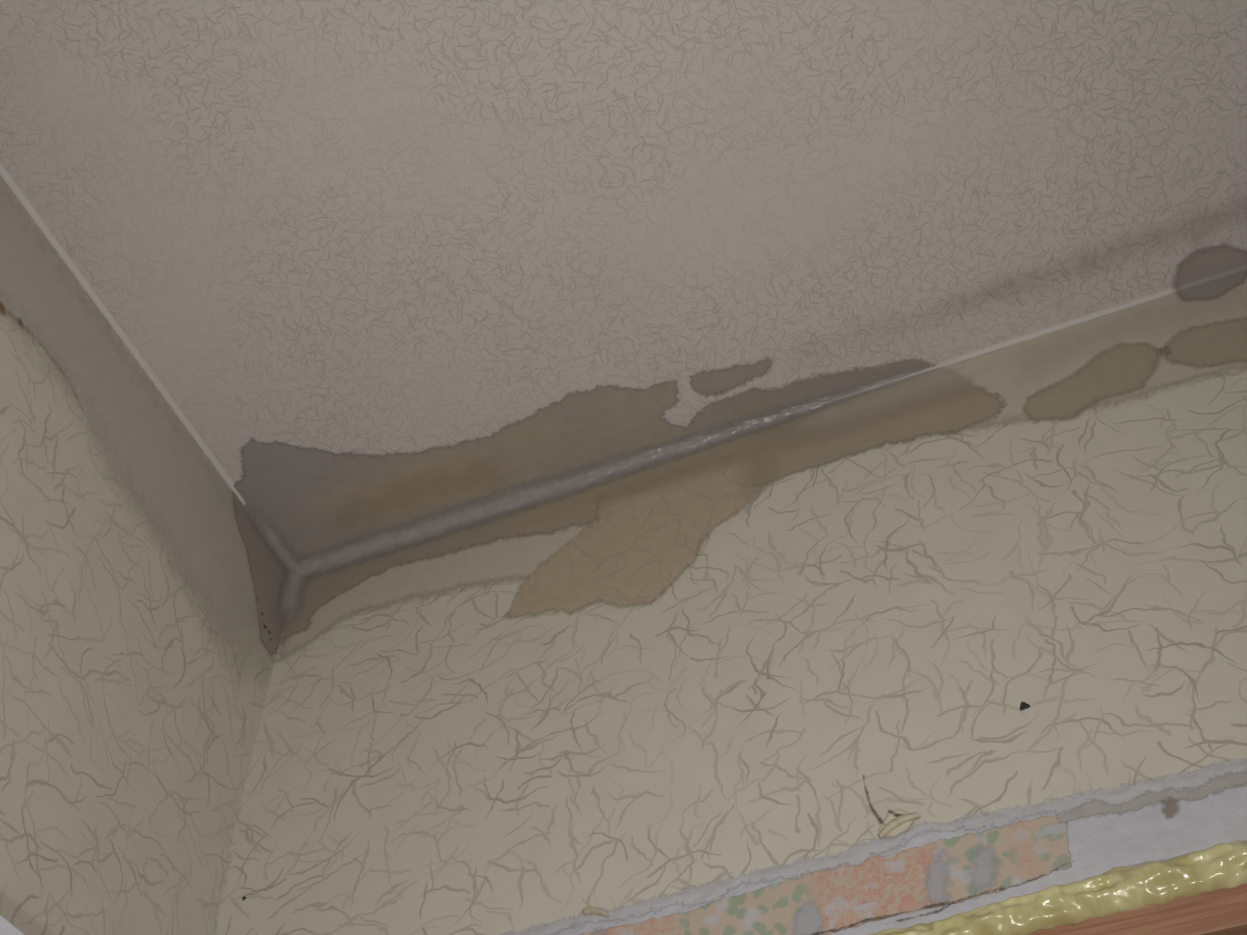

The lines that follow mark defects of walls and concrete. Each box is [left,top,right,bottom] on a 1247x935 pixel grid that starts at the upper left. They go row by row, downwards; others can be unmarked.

leakage [1175,245,1247,300]
leakage [1024,319,1247,421]
leakage [234,359,1004,655]
peeling [503,758,1247,935]